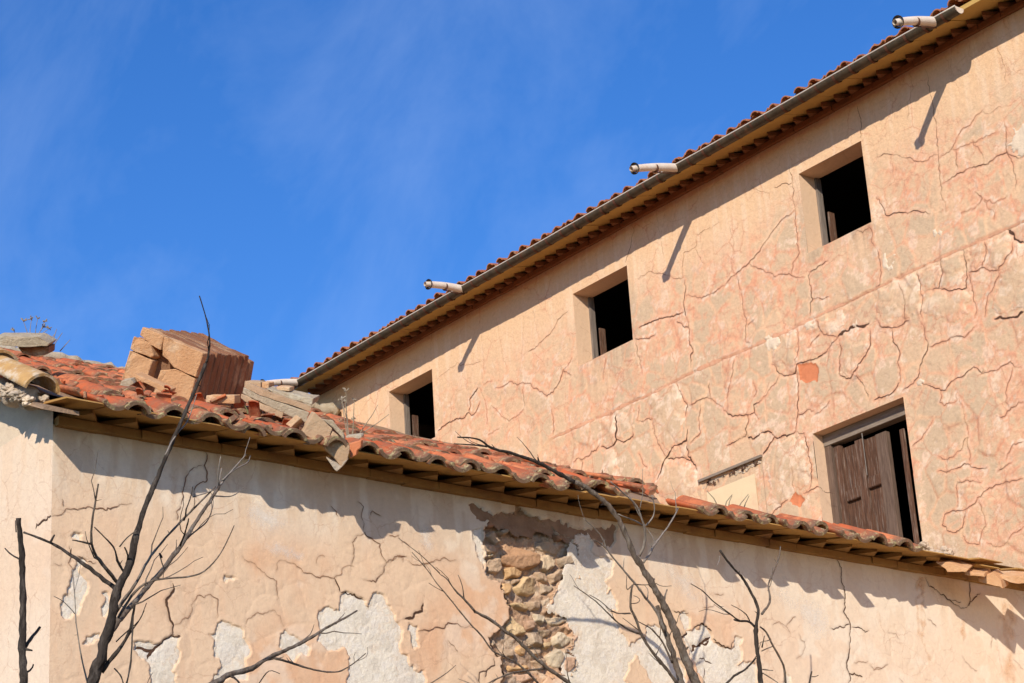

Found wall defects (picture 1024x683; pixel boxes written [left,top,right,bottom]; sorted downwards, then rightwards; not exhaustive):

flaking render [553,220,1024,438]
crack [575,69,1024,547]
peeling [60,559,87,619]
peeling [134,637,180,683]
crack [135,584,218,659]
peeling [211,621,250,680]
crack [243,502,454,622]
peeling [279,592,425,683]
crack [405,604,469,652]
spalling [469,503,756,683]
crack [675,594,733,683]
crack [833,560,903,682]